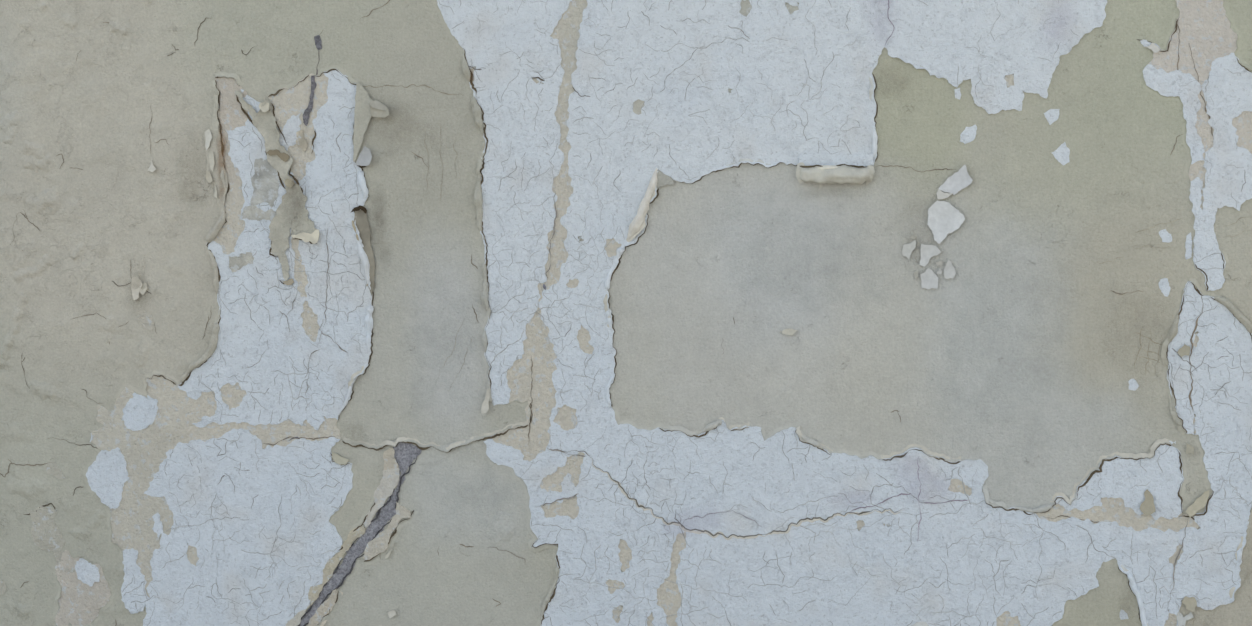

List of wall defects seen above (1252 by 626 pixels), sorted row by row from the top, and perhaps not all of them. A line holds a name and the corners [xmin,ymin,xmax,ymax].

peeling [83,65,390,626]
crack [286,442,422,626]
crack [528,359,968,541]
peeling [342,0,1252,626]